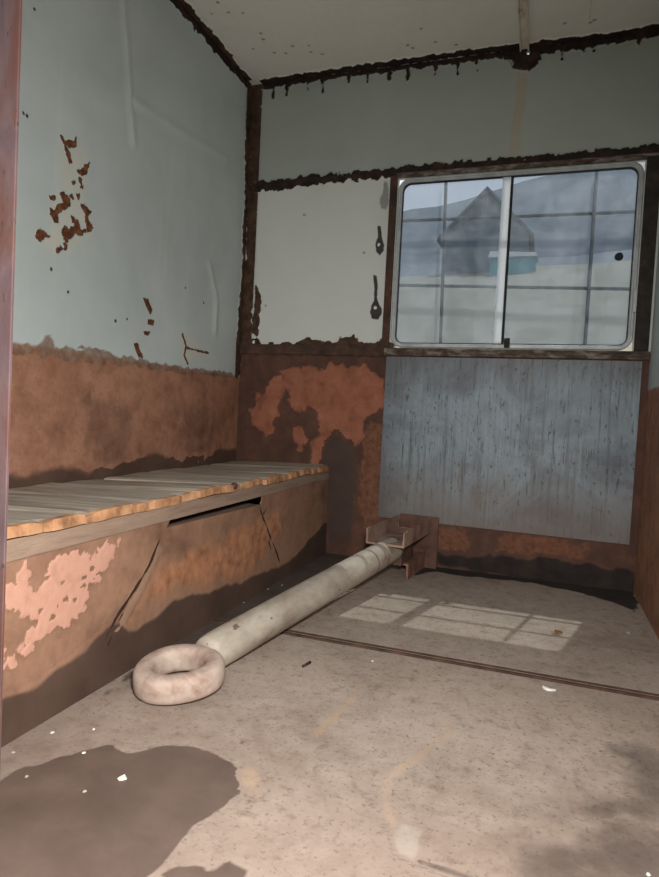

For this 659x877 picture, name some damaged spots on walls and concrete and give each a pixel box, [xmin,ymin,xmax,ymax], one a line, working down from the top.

rust [167,0,659,379]
rust [356,416,386,536]
peeling [0,535,123,678]
crack [105,537,164,646]
rust [437,524,475,552]
rust [490,530,598,560]
water stain [0,740,259,877]